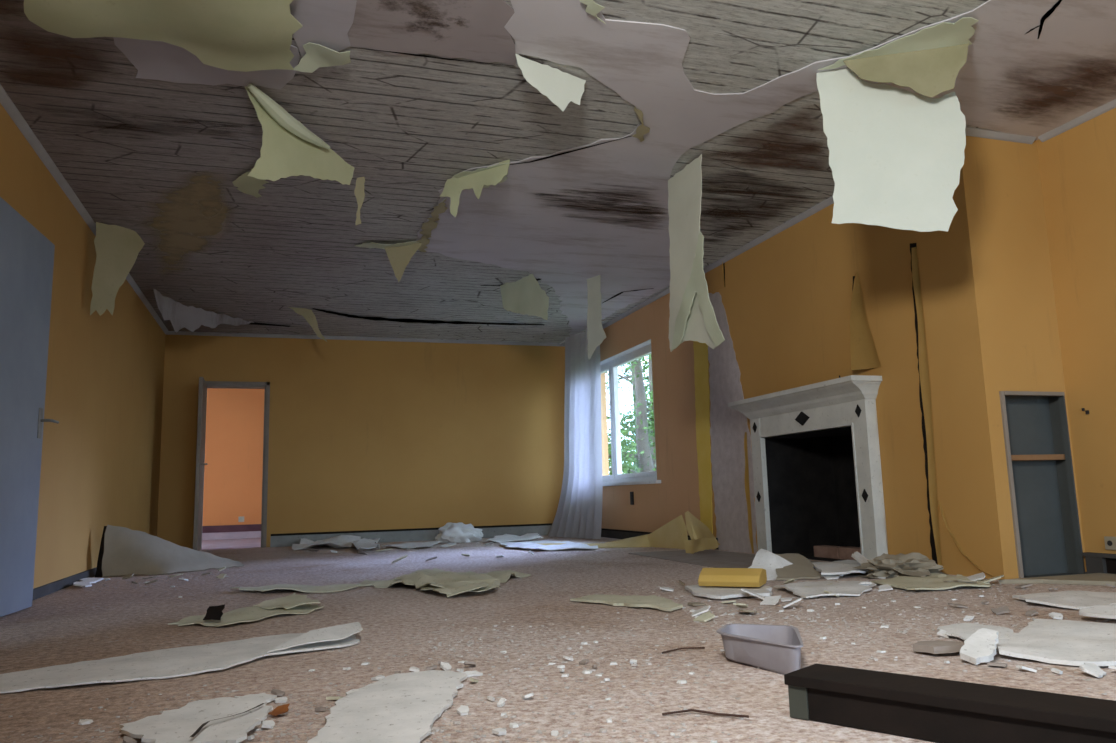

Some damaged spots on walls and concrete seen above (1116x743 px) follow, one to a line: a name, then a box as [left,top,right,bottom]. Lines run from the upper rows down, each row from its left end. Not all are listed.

crack [1026,0,1062,39]
leakage [1021,60,1116,114]
leakage [701,114,822,242]
leakage [535,185,661,227]
crack [249,320,290,328]
crack [312,308,545,325]